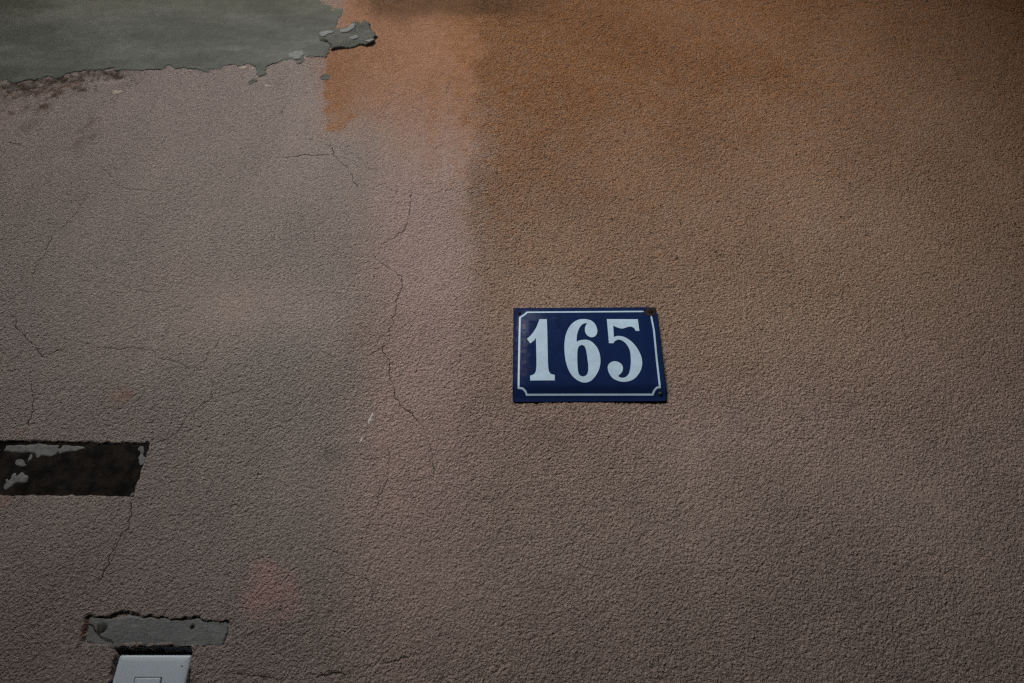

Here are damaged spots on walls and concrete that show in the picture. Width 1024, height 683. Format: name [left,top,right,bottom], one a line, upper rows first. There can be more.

crack [365,175,435,531]